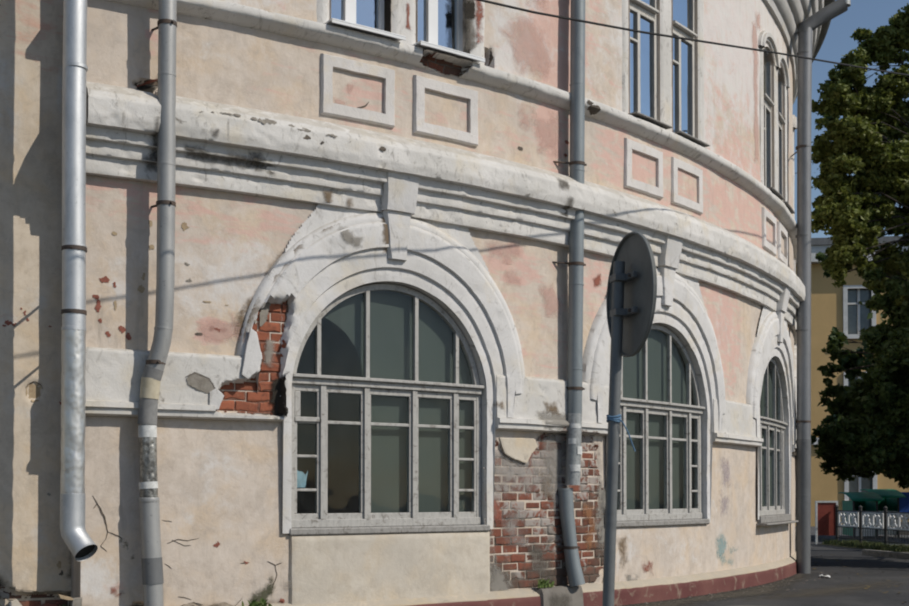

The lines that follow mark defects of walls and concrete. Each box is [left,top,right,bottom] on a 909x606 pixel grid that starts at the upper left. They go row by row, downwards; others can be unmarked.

spalling [420,49,471,77]
hole [135,79,158,93]
leakage [186,146,273,174]
peeling [93,295,131,340]
flaking render [186,300,288,416]
spalling [26,381,43,399]
crack [92,495,122,550]
flaking render [483,426,606,592]
spalling [0,582,71,606]